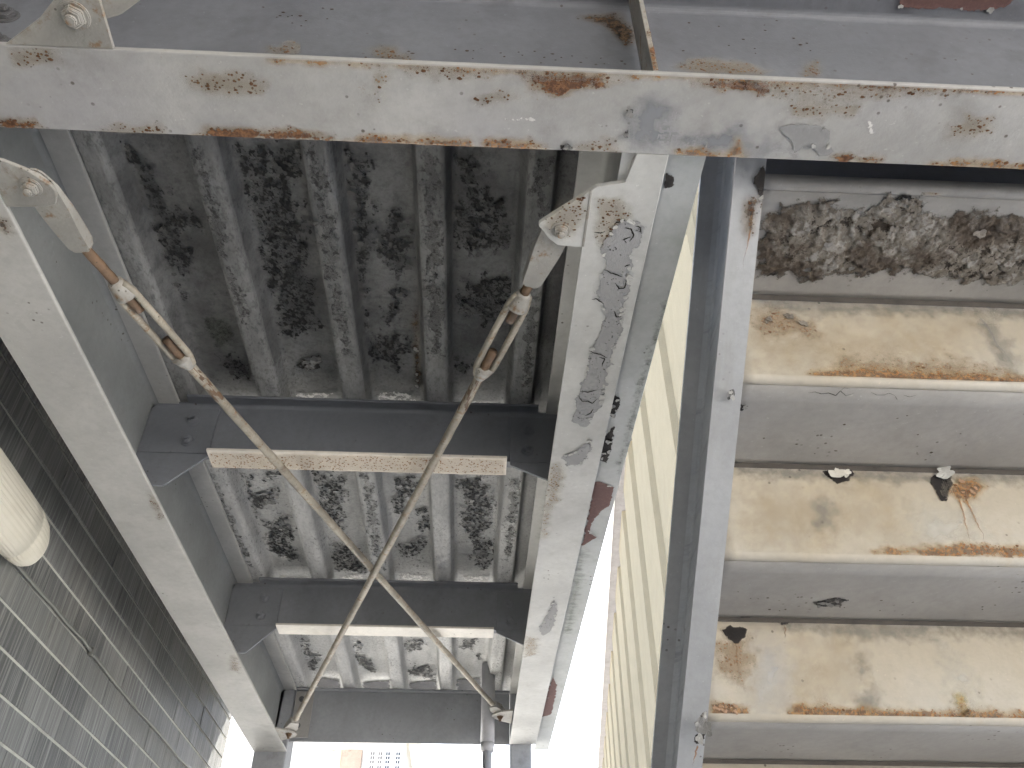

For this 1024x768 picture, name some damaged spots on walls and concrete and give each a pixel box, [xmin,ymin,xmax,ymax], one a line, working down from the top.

corrosion [515,46,660,96]
corrosion [680,59,1024,116]
corrosion [199,126,333,141]
spalling [756,192,1024,286]
peeling [572,219,645,427]
corrosion [809,356,1024,382]
peeling [828,468,851,478]
peeling [936,466,955,479]
peeling [581,482,615,545]
corrosion [874,543,1024,558]
peeling [814,598,849,608]
corrosion [787,695,1024,718]